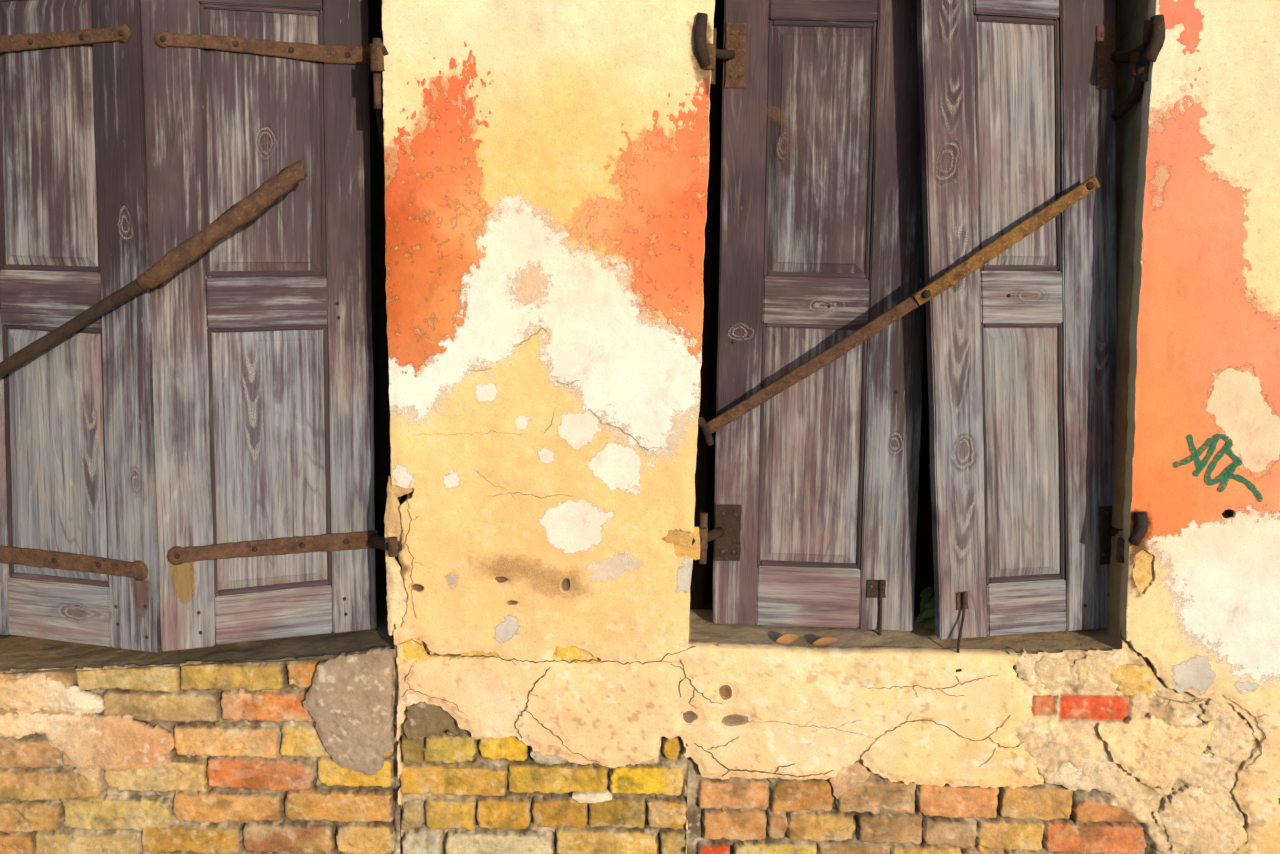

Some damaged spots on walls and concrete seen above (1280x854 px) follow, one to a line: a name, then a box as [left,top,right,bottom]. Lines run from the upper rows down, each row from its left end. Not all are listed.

peeling [1159,0,1204,55]
peeling [385,42,710,497]
peeling [1130,95,1280,694]
spalling [384,465,416,636]
peeling [495,615,519,643]
peeling [538,499,642,581]
spalling [662,526,700,593]
crack [399,492,1025,778]
spalling [0,630,1259,854]